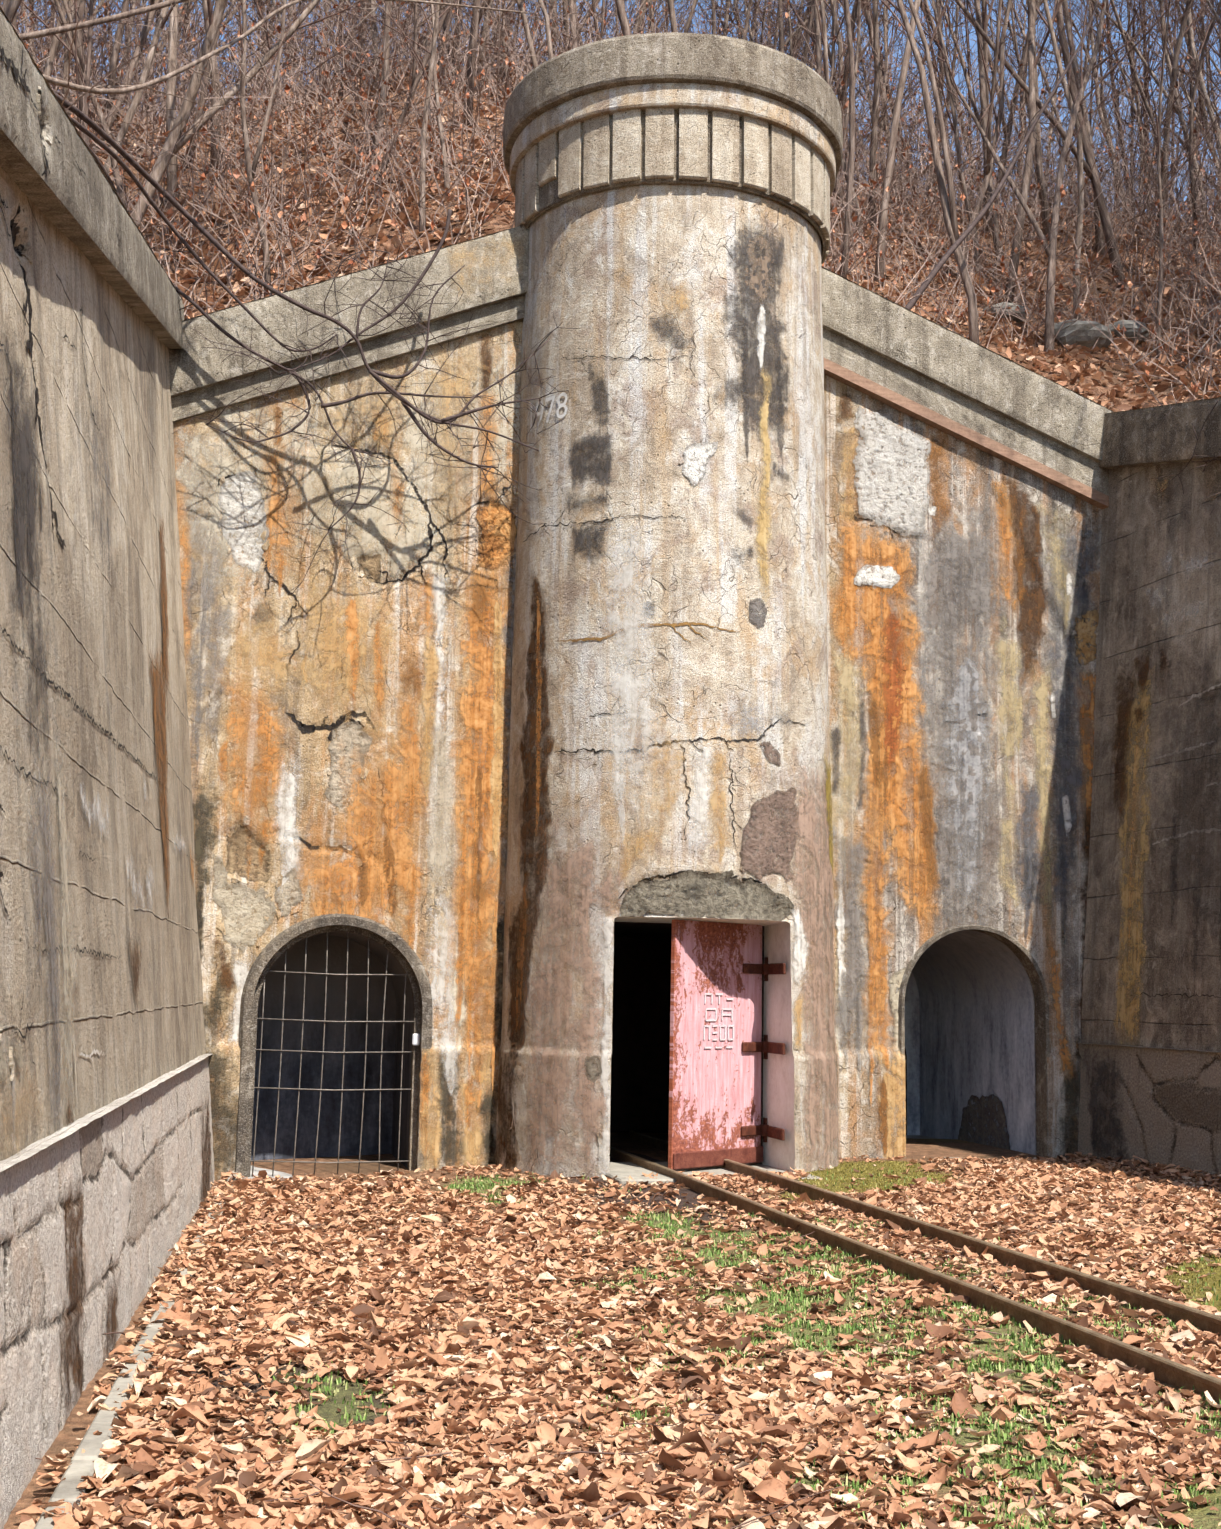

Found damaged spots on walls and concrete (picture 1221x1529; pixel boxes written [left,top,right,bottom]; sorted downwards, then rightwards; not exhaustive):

water stain [6,342,57,758]
crack [0,194,100,554]
peeling [218,470,271,572]
crack [249,536,377,753]
rust [301,576,429,946]
rust [452,561,554,1109]
water stain [568,365,612,507]
crack [556,691,808,900]
spalling [619,788,800,921]
water stain [725,225,789,592]
rust [833,525,937,920]
peeling [852,406,937,537]